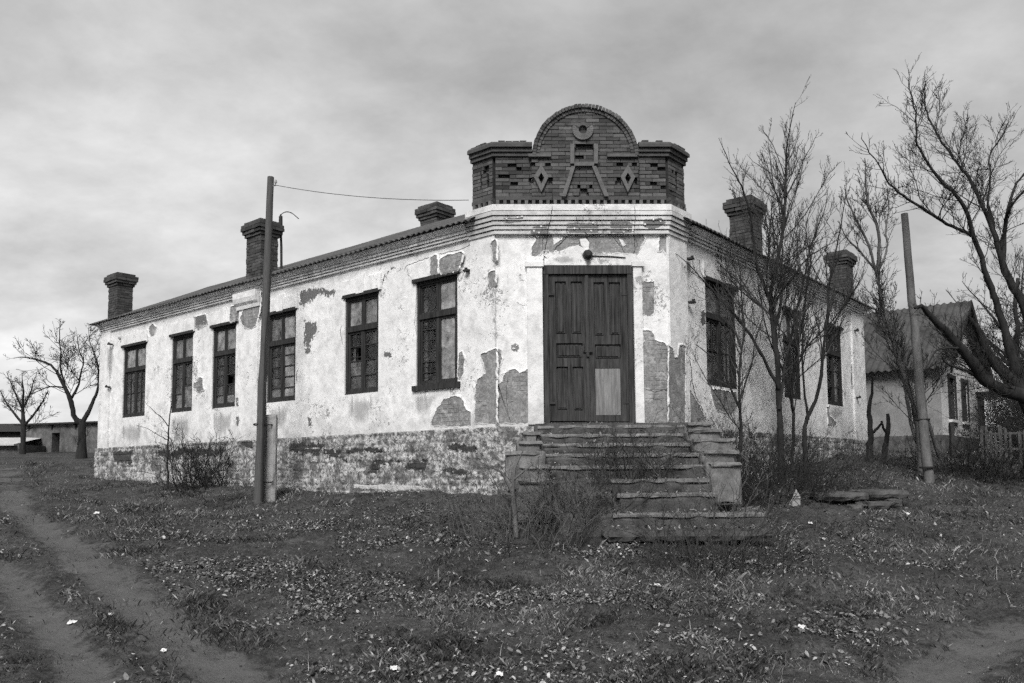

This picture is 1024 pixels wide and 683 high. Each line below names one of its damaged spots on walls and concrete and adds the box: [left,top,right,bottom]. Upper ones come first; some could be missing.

flaking render [429,250,465,276]
flaking render [529,218,670,257]
flaking render [229,290,262,330]
flaking render [299,285,335,354]
flaking render [642,280,738,423]
flaking render [430,347,528,428]